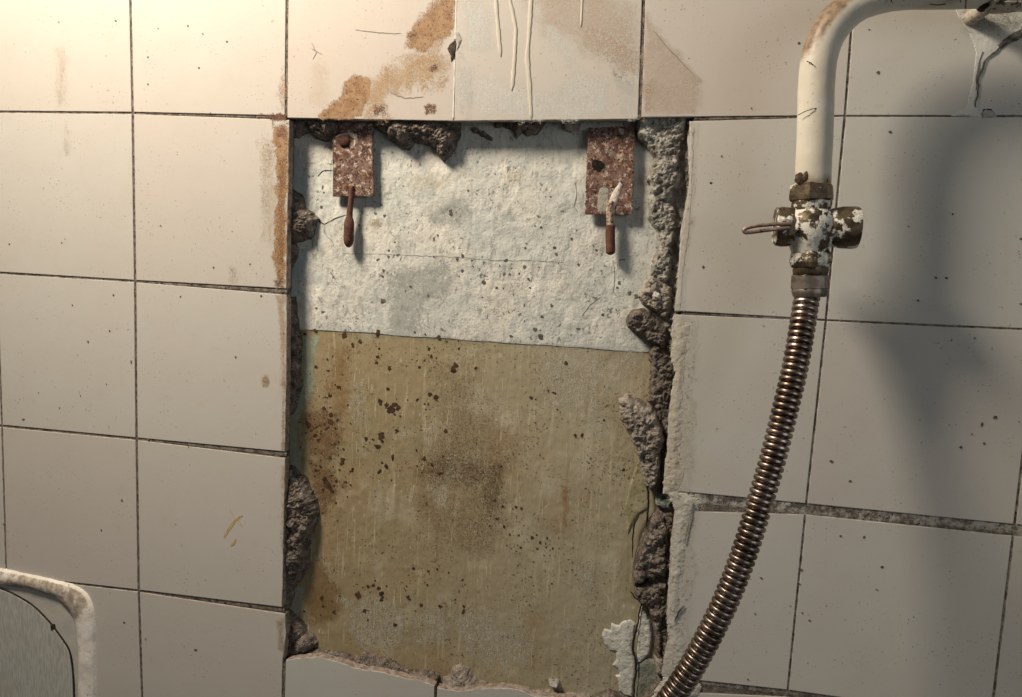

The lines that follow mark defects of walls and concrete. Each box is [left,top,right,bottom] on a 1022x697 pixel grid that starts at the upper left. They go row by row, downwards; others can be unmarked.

rust [309,0,457,125]
leakage [519,0,705,121]
crack [930,3,1022,108]
spalling [374,121,547,163]
rust [256,59,290,451]
rust [298,343,360,514]
spalling [282,120,507,688]
leakage [402,345,525,559]
leakage [533,333,650,448]
spalling [525,117,694,697]
leakage [336,590,535,671]